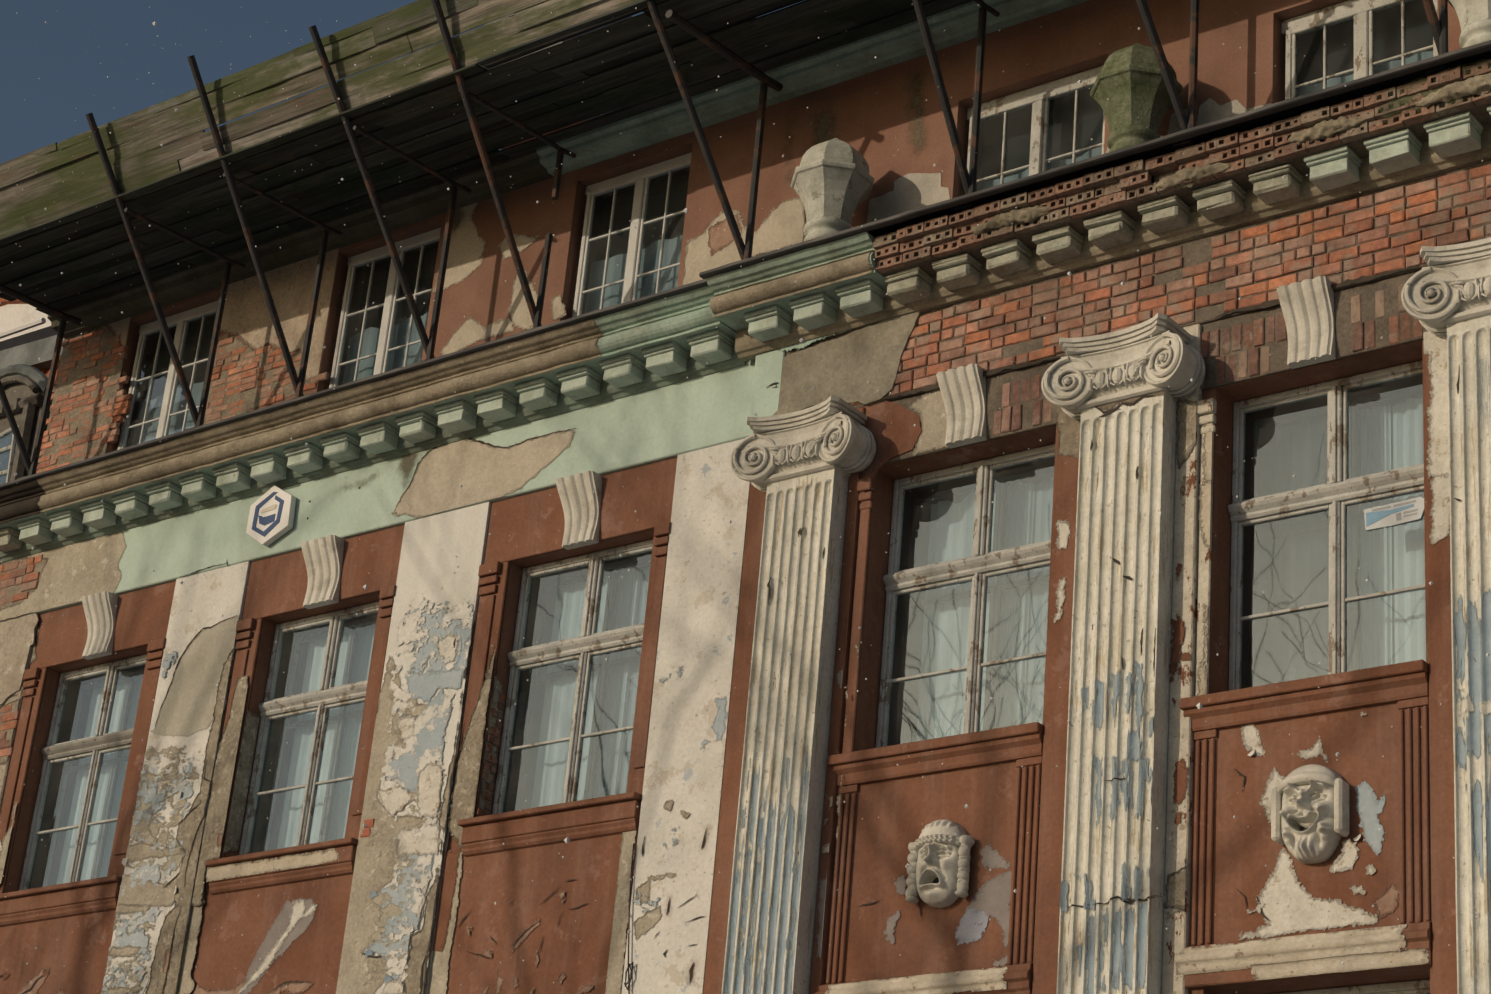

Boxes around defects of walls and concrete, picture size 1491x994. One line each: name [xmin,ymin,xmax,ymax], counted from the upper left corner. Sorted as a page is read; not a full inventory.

flaking render [2,203,603,524]
flaking render [772,164,1491,550]
peeling [0,531,127,765]
spalling [101,597,588,994]
peeling [721,729,842,994]
peeling [825,842,1012,994]
peeling [1053,577,1067,623]
crack [1055,895,1166,908]
peeling [1060,856,1186,994]
peeling [1240,724,1286,823]
peeling [1174,781,1429,980]
peeling [1454,588,1491,895]